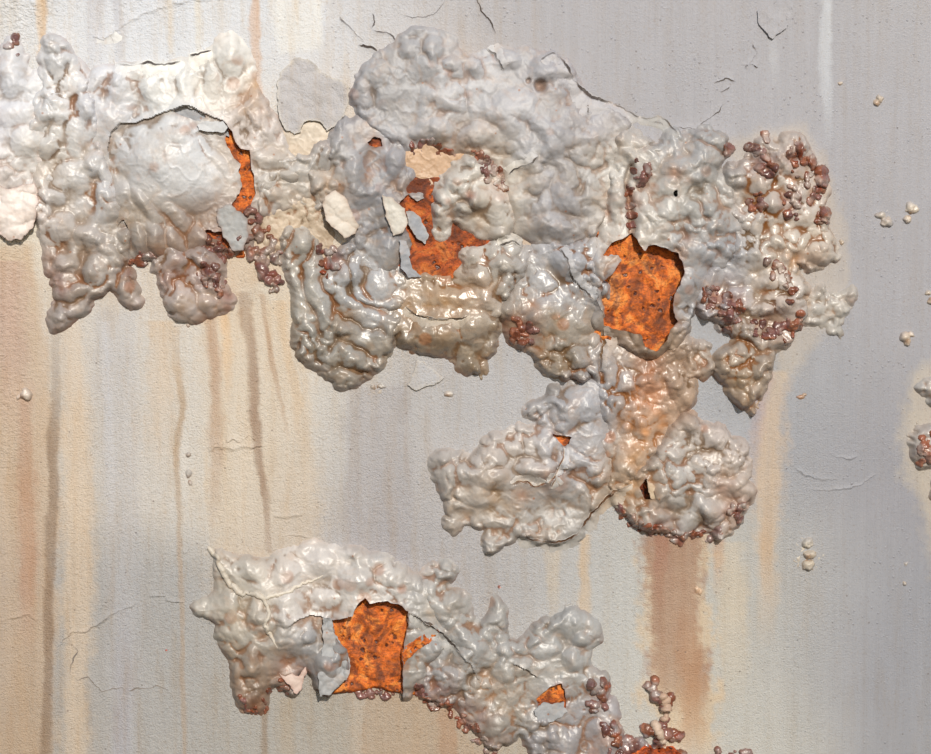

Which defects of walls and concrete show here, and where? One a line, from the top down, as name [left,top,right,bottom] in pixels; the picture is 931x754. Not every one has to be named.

rust [33,0,51,67]
crack [333,0,445,61]
crack [468,0,509,71]
peeling [276,57,350,134]
rust [724,116,854,293]
rust [0,235,102,754]
rust [621,326,829,754]